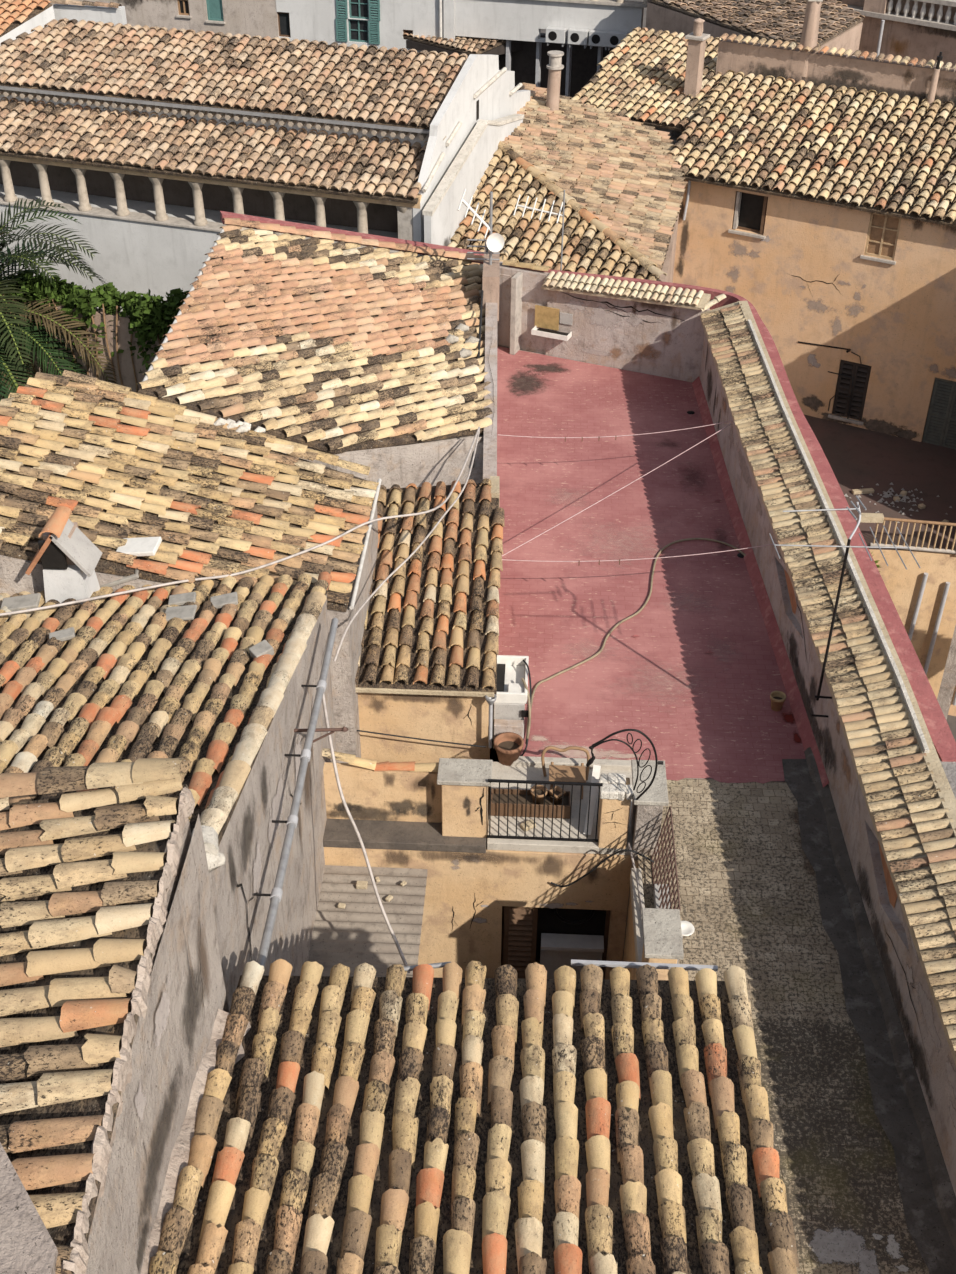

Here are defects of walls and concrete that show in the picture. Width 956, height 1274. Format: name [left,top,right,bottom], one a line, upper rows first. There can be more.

leakage [511,364,566,395]
peeling [857,1233,883,1274]